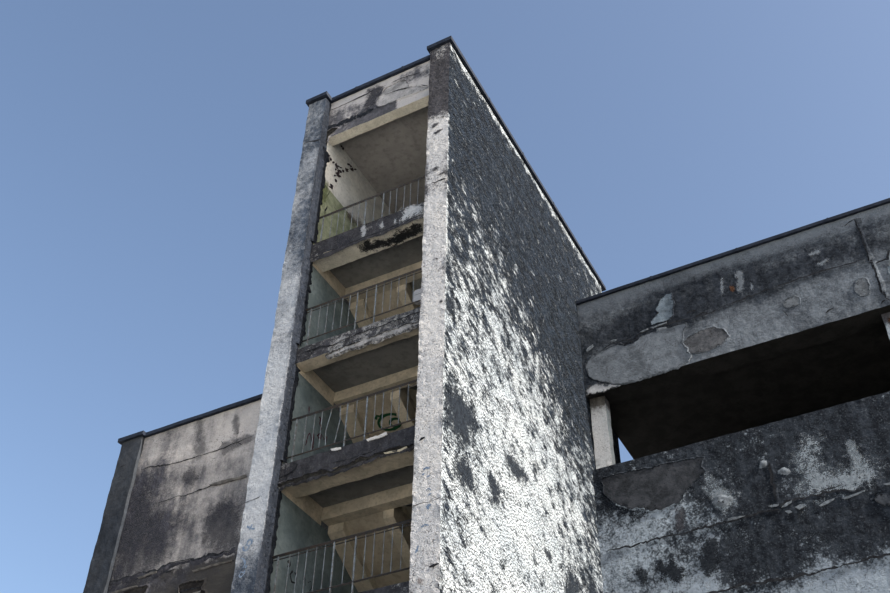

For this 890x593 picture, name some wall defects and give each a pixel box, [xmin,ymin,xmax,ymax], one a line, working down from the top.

spalling [357,223,423,253]
water stain [440,293,455,316]
crack [591,218,890,358]
spalling [325,321,419,359]
spalling [584,293,730,385]
crack [119,435,254,470]
water stain [439,371,502,510]
water stain [503,449,529,488]
water stain [202,501,241,550]
spalling [260,437,425,593]
crack [607,484,863,555]
crack [707,553,890,593]